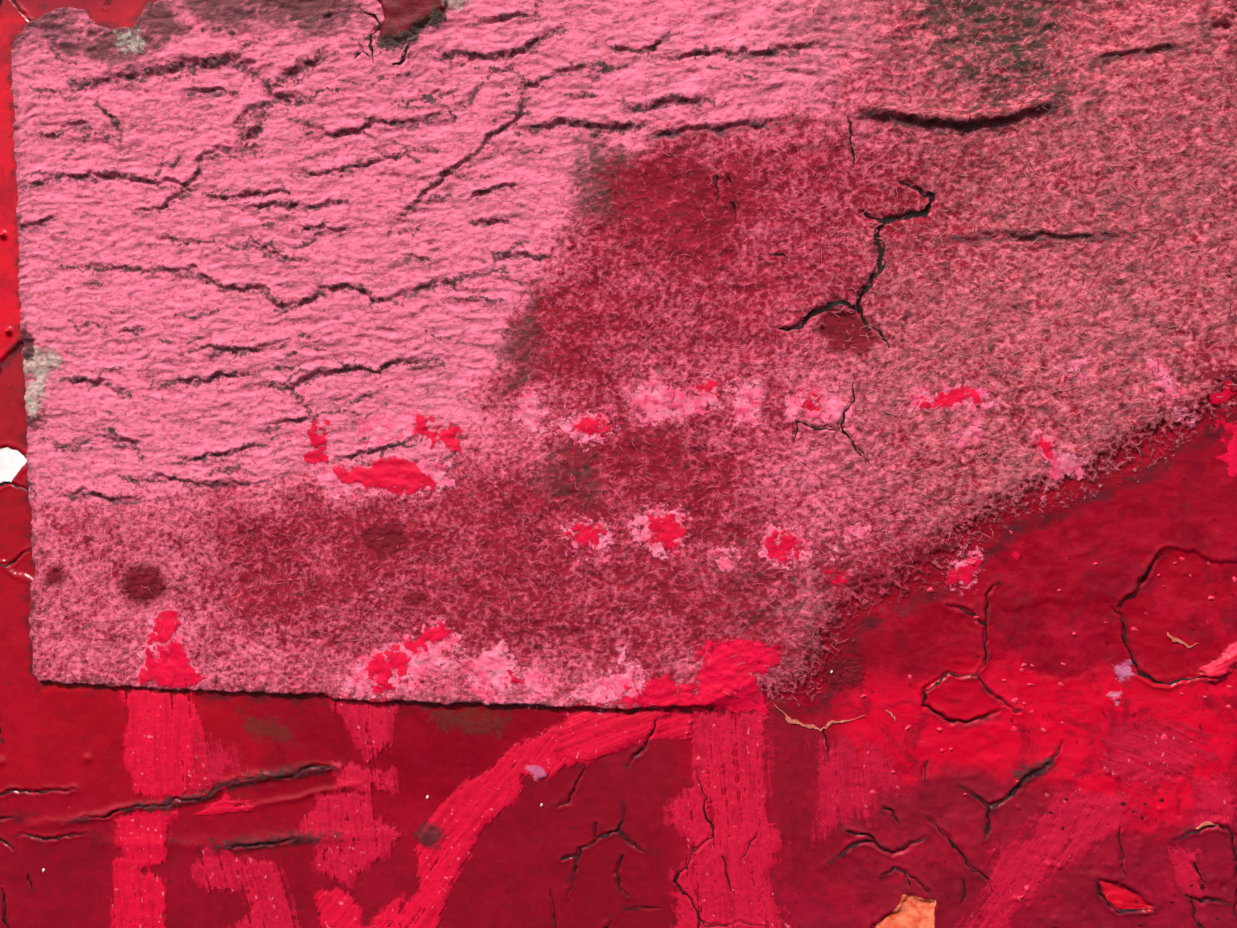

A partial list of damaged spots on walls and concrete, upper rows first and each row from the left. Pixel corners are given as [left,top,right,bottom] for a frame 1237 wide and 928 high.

crack [354,8,411,66]
crack [779,182,935,348]
crack [795,381,874,469]
crack [921,581,1022,723]
crack [1111,548,1224,685]
peeling [1198,642,1237,683]
peeling [774,704,865,731]
crack [0,765,334,849]
crack [549,766,765,928]
peeling [876,895,936,928]
crack [829,807,999,904]
crack [1174,824,1237,928]